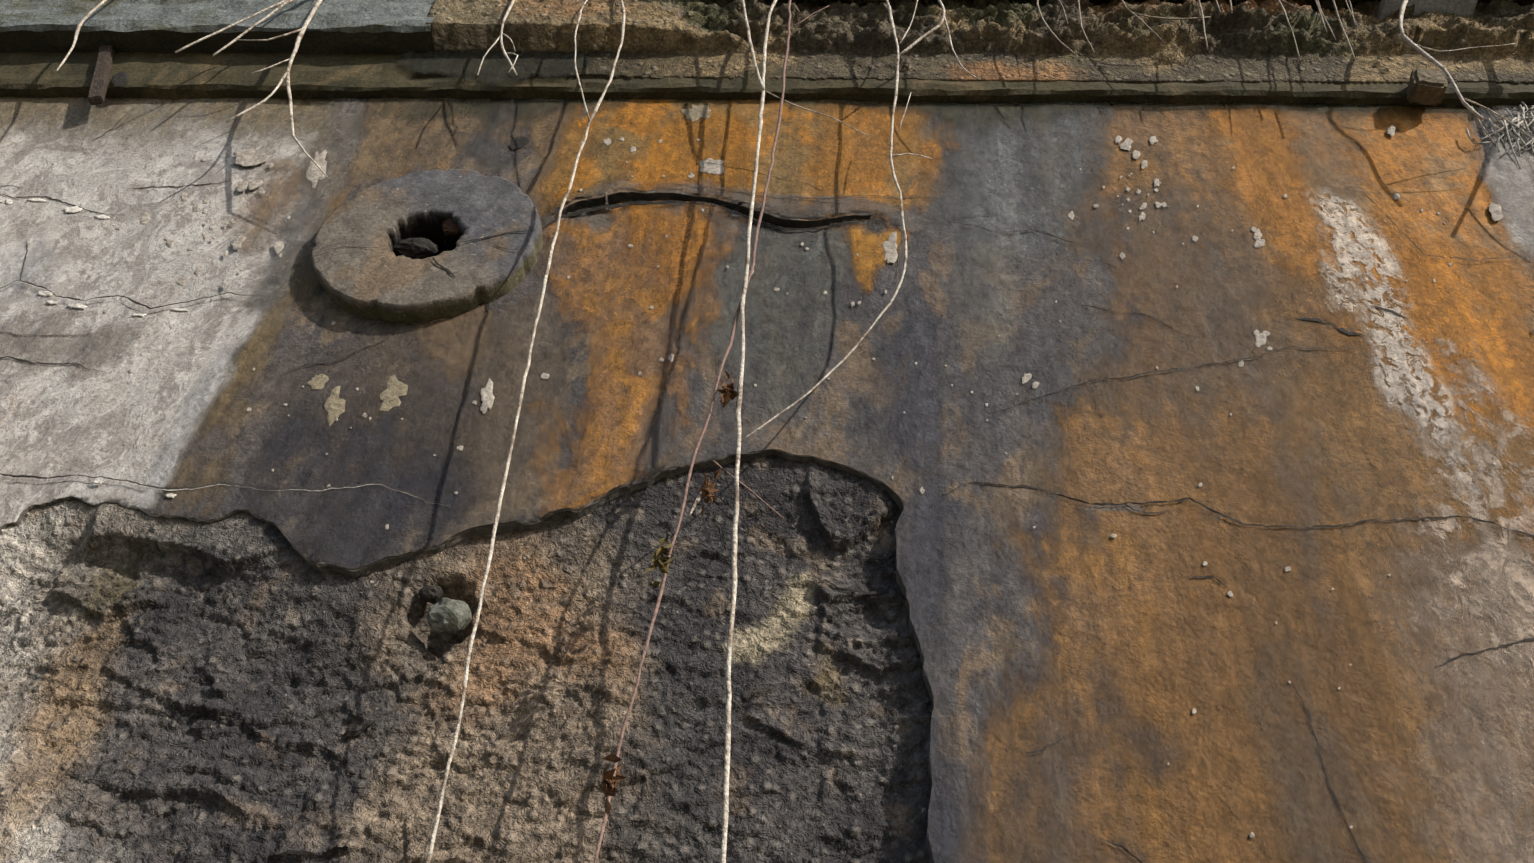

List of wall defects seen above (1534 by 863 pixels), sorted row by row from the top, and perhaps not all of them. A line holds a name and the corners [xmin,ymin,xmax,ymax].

crack [0,181,226,219]
crack [0,241,260,372]
crack [0,473,449,506]
spalling [0,455,933,863]
damp [0,97,1279,863]
corrosion [538,99,940,516]
crack [432,183,1088,278]
crack [933,482,1534,537]
corrosion [951,103,1534,863]
damp [1288,105,1534,667]